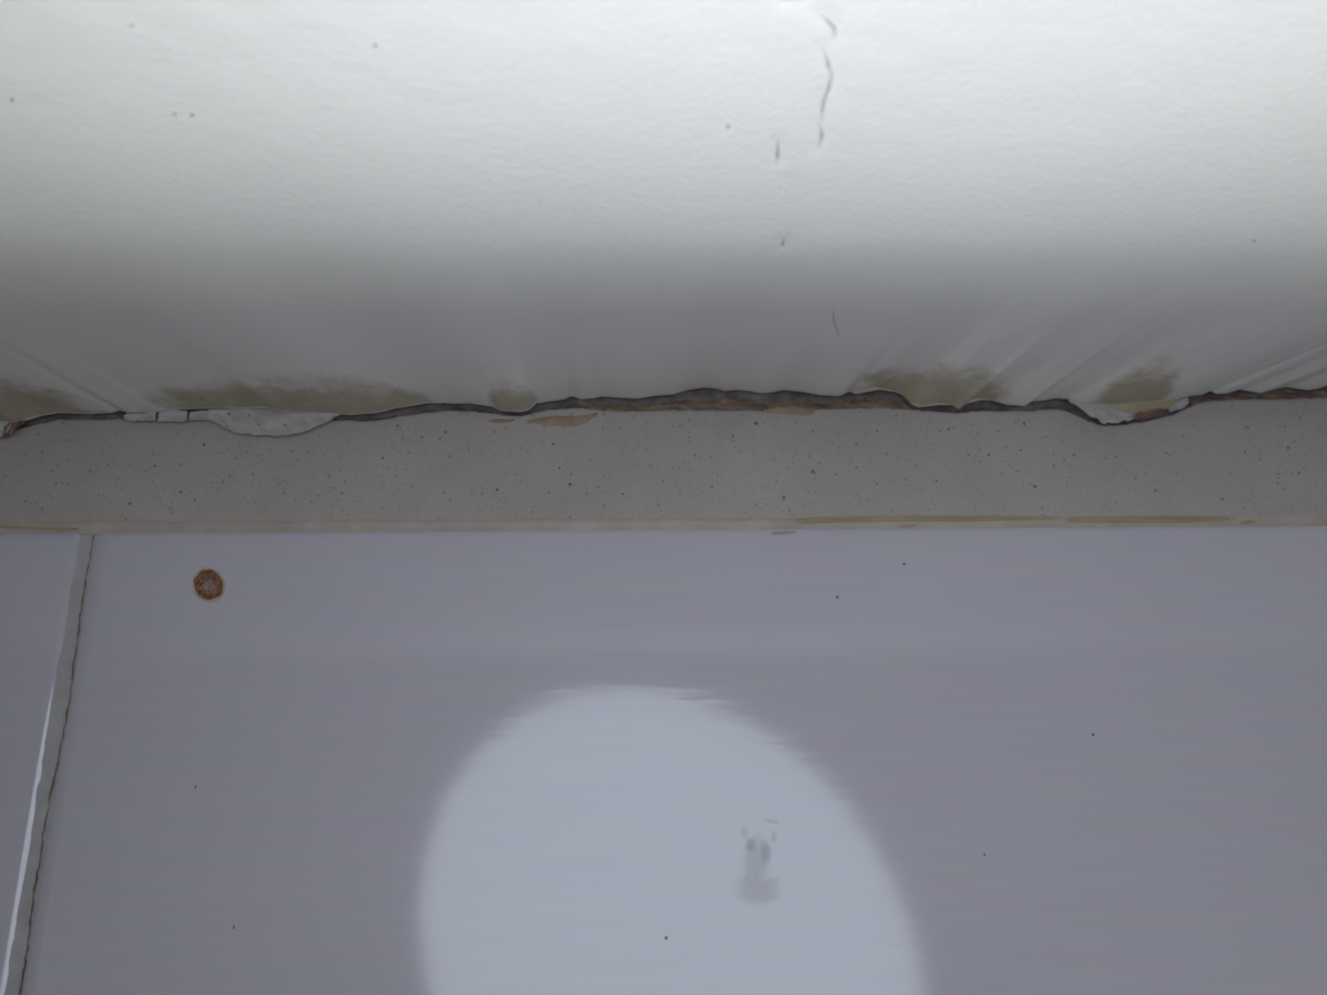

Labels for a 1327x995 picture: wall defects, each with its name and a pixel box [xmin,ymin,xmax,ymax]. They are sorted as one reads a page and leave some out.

peeling [124,408,340,437]
spalling [488,397,911,427]
peeling [1068,390,1327,425]
corrosion [193,568,225,602]